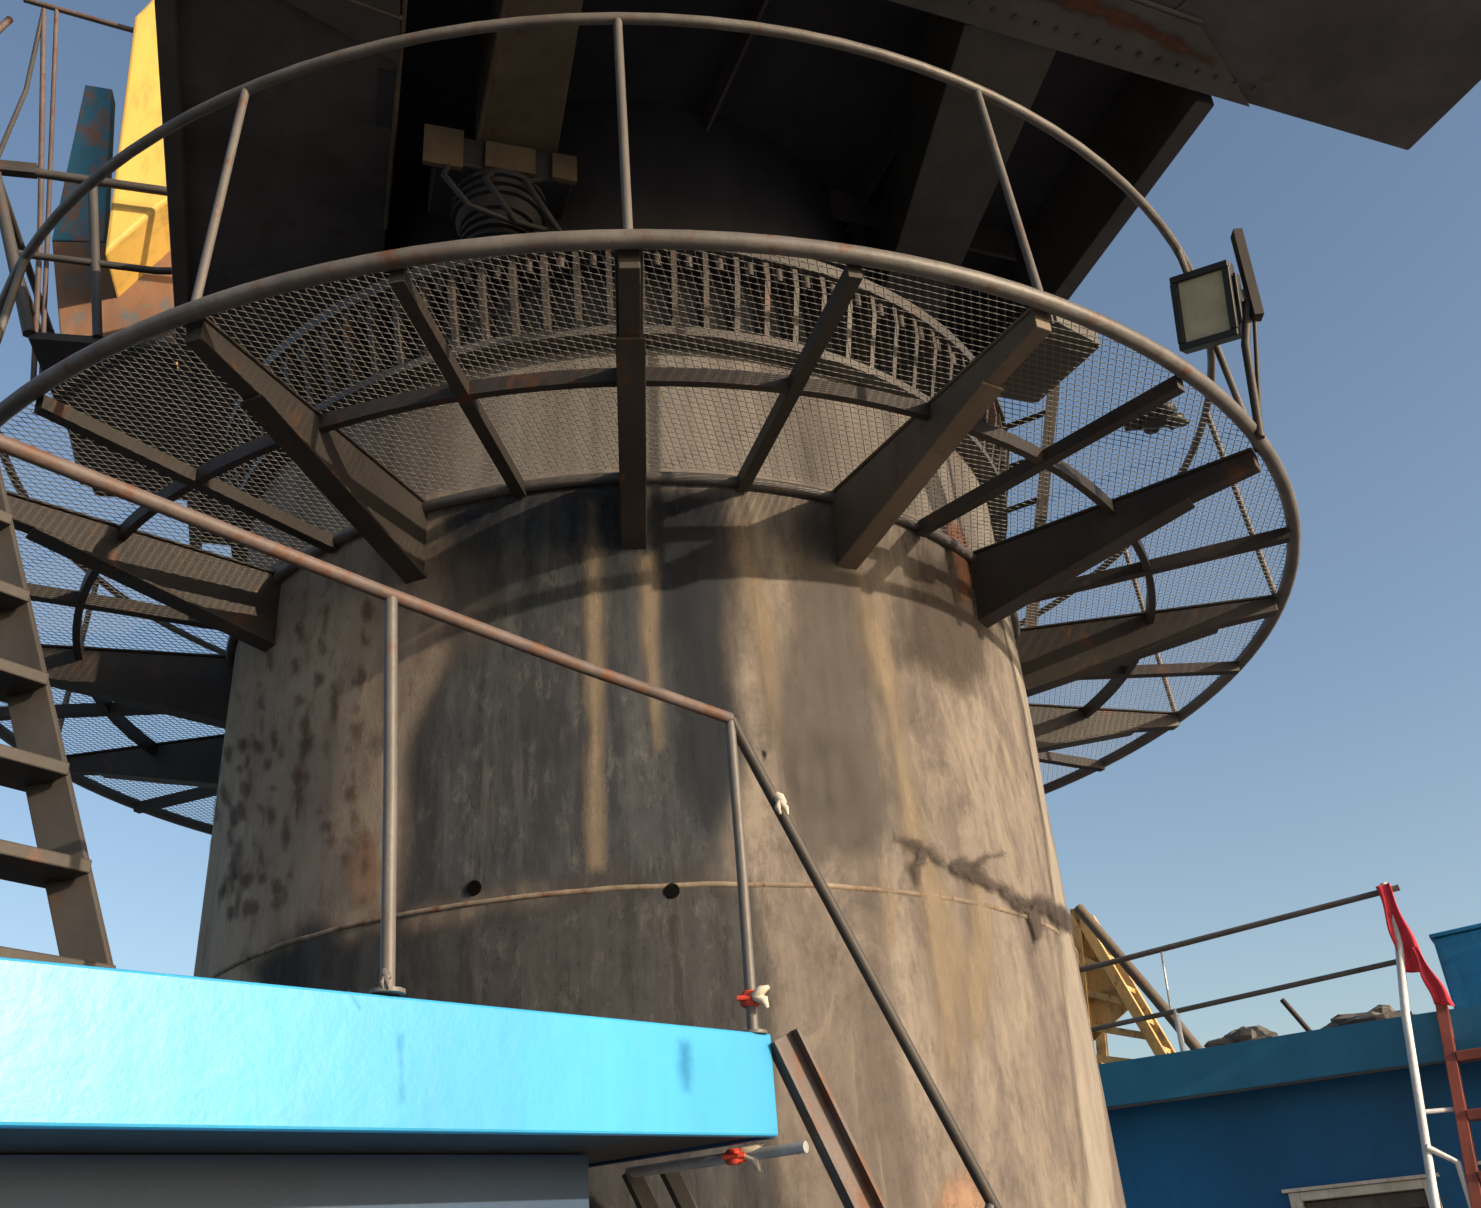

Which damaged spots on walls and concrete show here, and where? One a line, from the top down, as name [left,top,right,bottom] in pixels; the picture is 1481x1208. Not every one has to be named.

water stain [257,484,775,1042]
water stain [588,1139,781,1208]